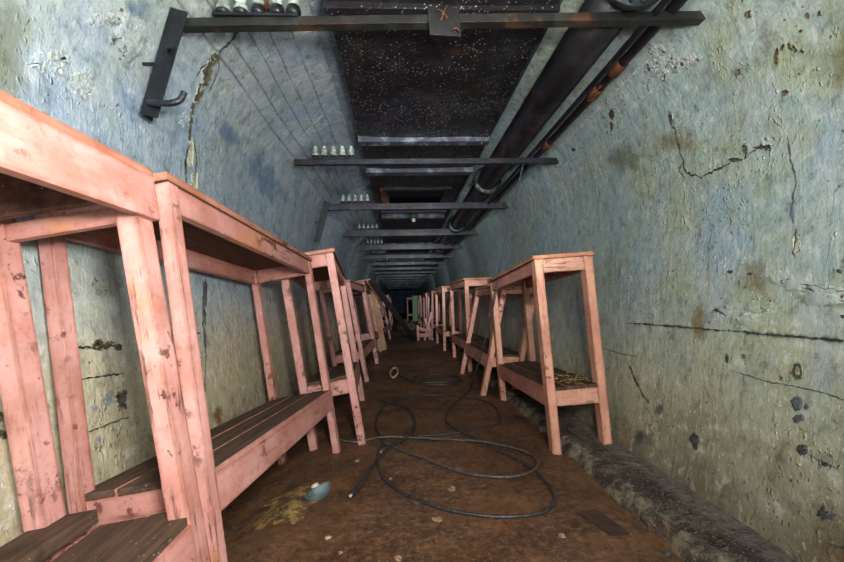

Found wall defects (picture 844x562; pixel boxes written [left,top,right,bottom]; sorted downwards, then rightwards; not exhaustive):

crack [670,115,797,224]
crack [78,343,121,351]
crack [197,279,207,391]
crack [628,323,844,343]
crack [82,372,124,380]
crack [604,348,649,403]
crack [732,371,844,400]
peeling [790,396,809,423]
crack [88,417,129,432]